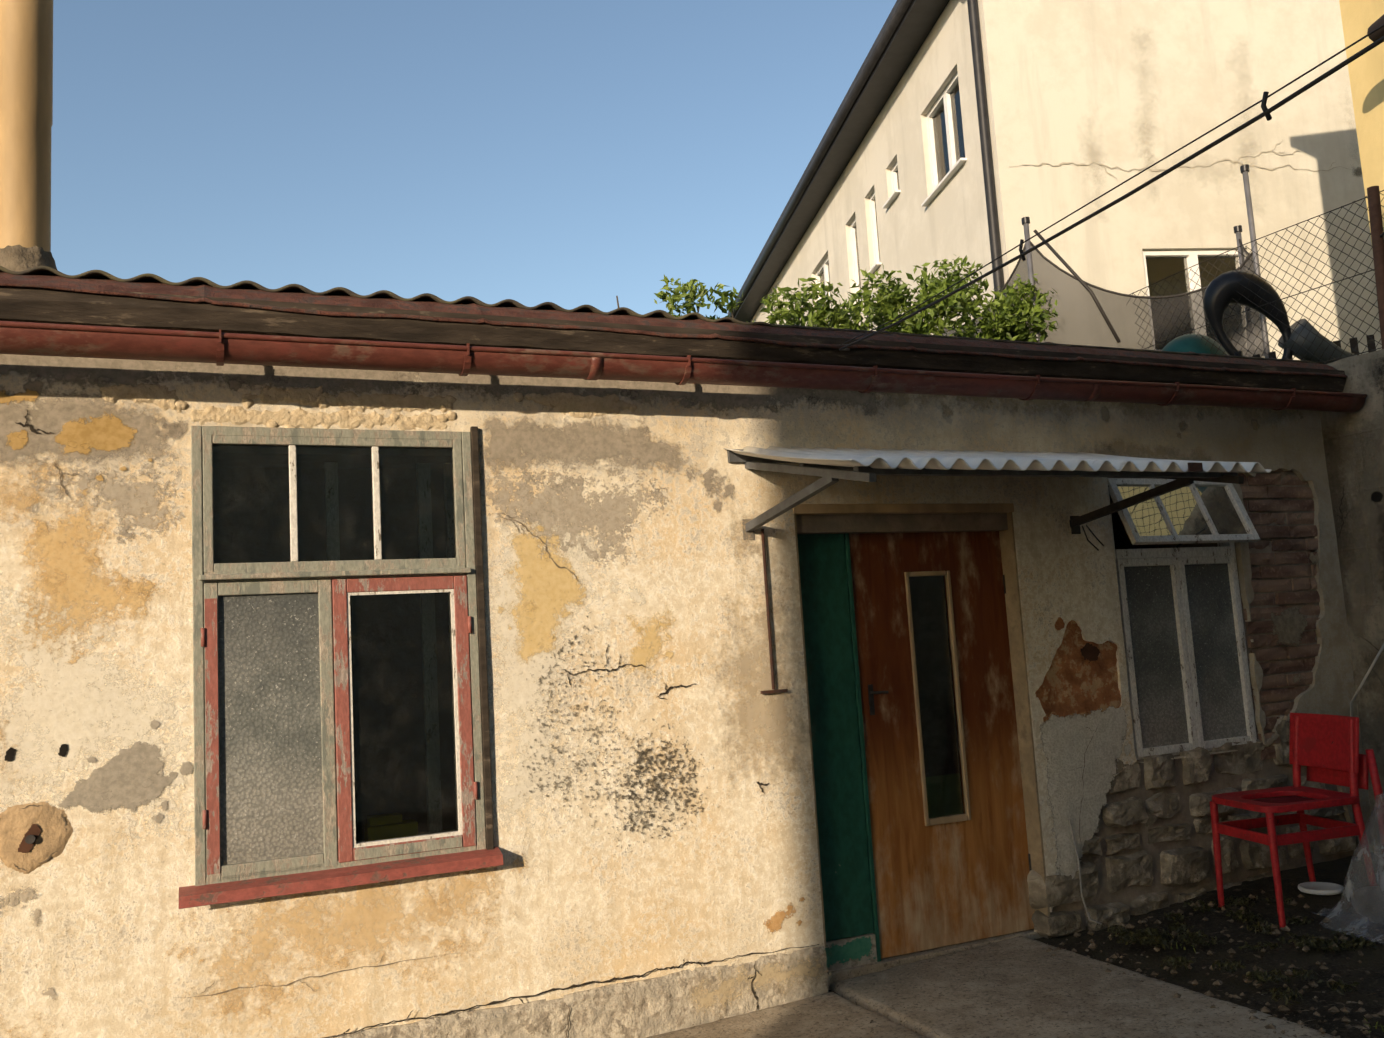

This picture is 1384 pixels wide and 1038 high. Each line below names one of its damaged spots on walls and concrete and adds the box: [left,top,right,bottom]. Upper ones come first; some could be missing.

crack [1009,139,1353,179]
peeling [0,383,458,642]
crack [496,513,583,587]
peeling [479,464,669,663]
leakage [481,515,714,853]
crack [563,645,693,700]
peeling [627,611,674,673]
spalling [1035,617,1126,723]
peeling [57,719,193,823]
peeling [0,887,41,926]